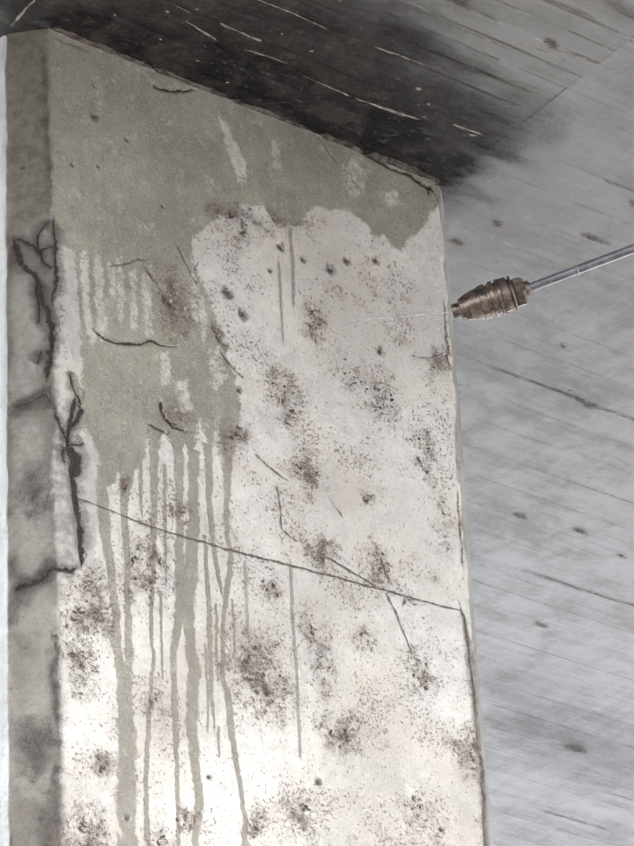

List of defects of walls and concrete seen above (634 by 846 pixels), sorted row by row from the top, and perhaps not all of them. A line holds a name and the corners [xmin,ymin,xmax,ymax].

crack [6,217,490,846]
leakage [5,6,497,846]
crack [485,366,634,421]
crack [520,569,634,607]